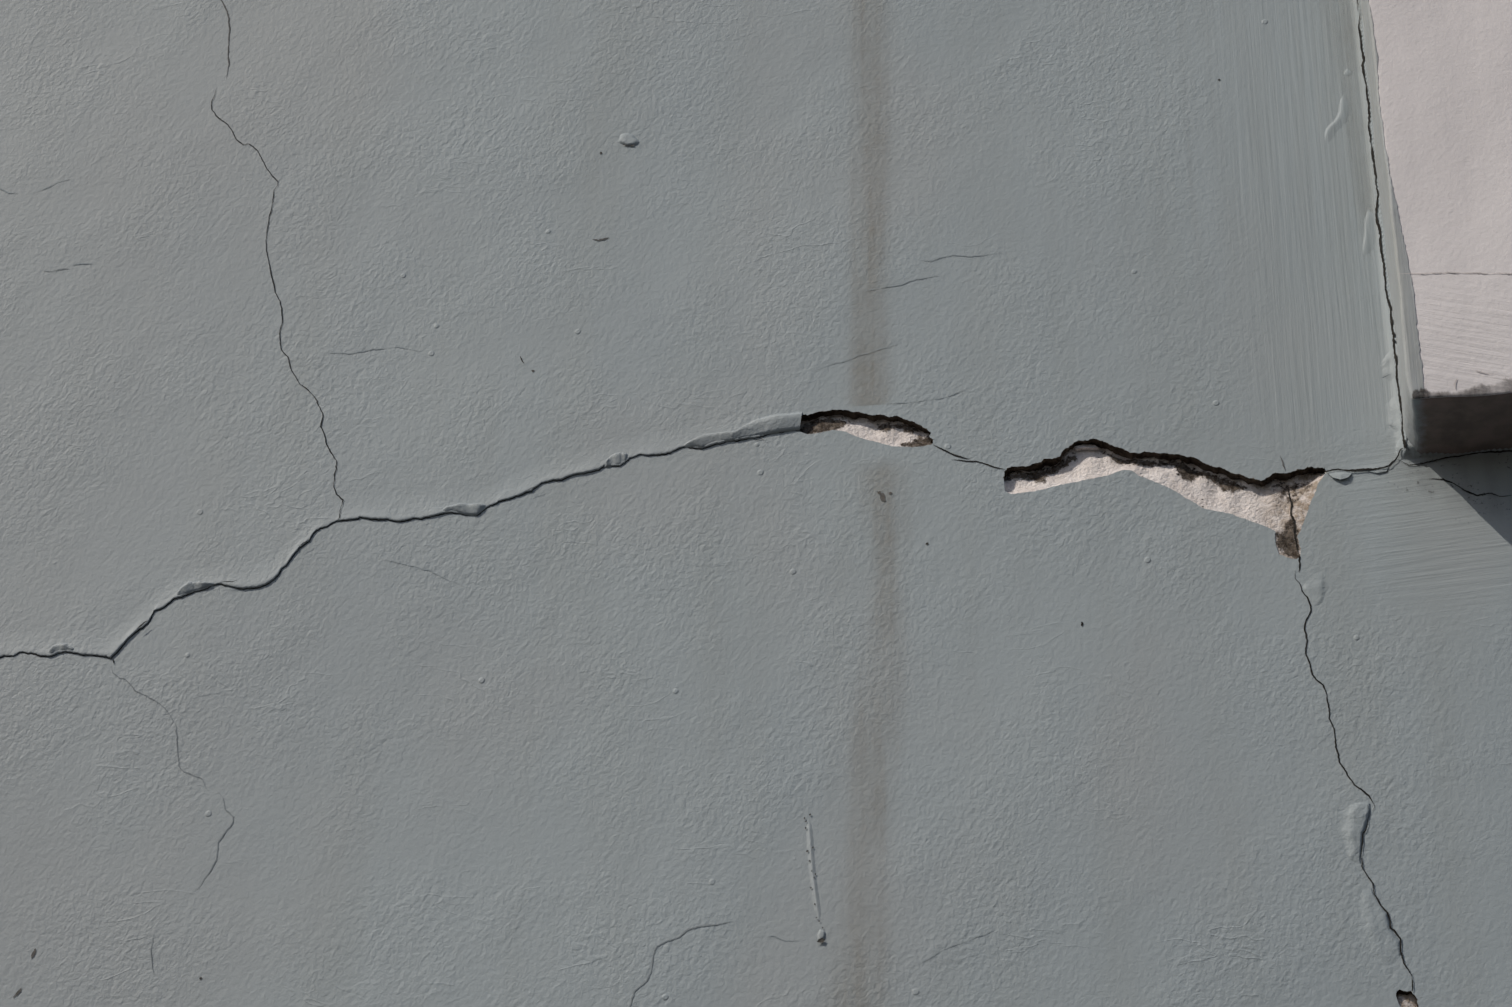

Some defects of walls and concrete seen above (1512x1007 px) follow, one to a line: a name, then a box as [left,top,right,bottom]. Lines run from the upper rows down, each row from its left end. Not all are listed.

crack [1325,0,1512,497]
crack [0,0,800,891]
spalling [800,410,934,448]
crack [933,440,1002,469]
spalling [1003,439,1326,559]
crack [1295,556,1413,991]
crack [629,921,733,1007]